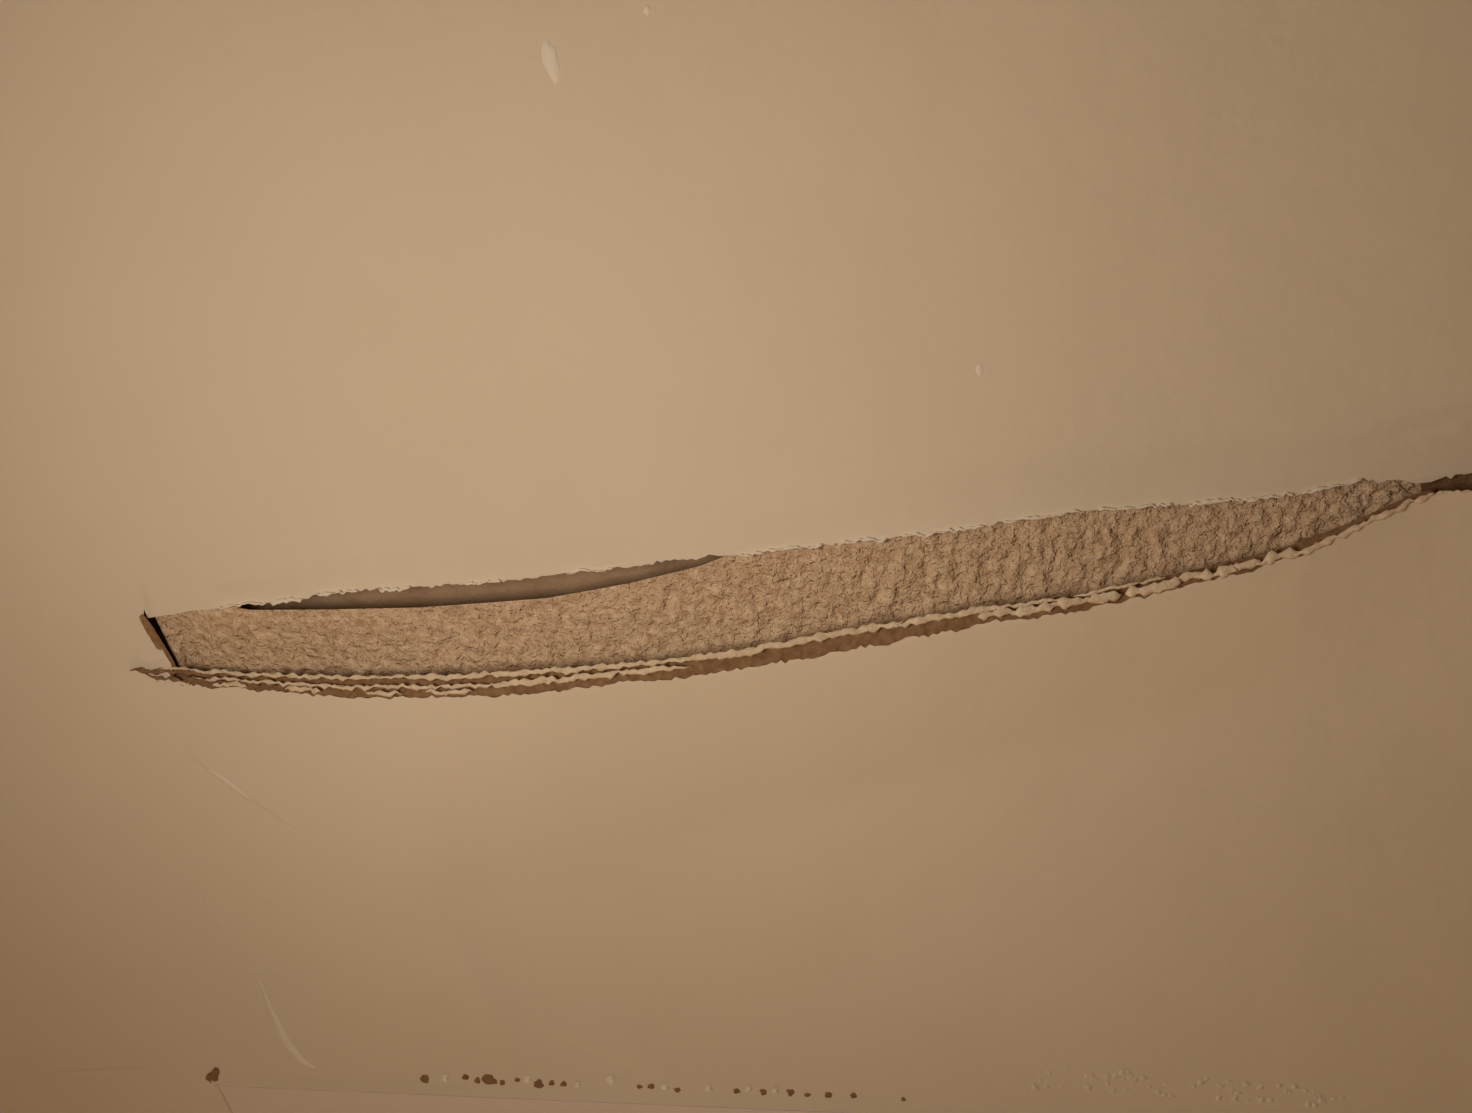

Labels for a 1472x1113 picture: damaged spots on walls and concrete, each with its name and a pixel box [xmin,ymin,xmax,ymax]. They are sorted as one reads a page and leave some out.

crack [1421,473,1472,497]